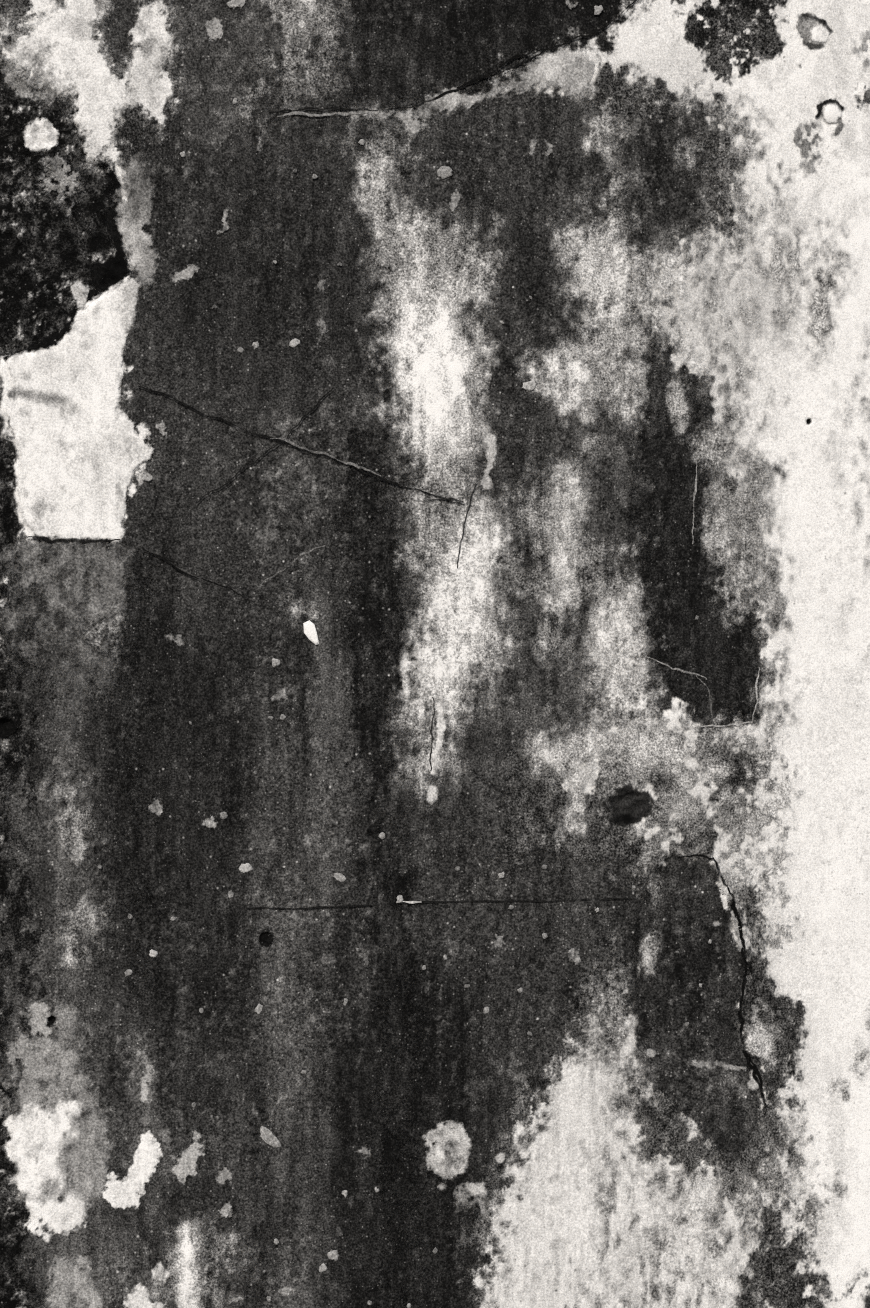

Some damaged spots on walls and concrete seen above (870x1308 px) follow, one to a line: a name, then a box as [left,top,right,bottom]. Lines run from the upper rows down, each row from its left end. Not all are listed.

crack [269,0,637,117]
water stain [755,222,850,364]
peeling [0,0,179,905]
water stain [15,532,70,574]
crack [680,854,767,1115]
peeling [0,989,113,1308]
water stain [518,1112,550,1148]
water stain [489,1236,504,1262]
water stain [597,1150,620,1254]
water stain [639,1228,693,1308]
water stain [705,1232,732,1259]
water stain [796,1197,818,1236]